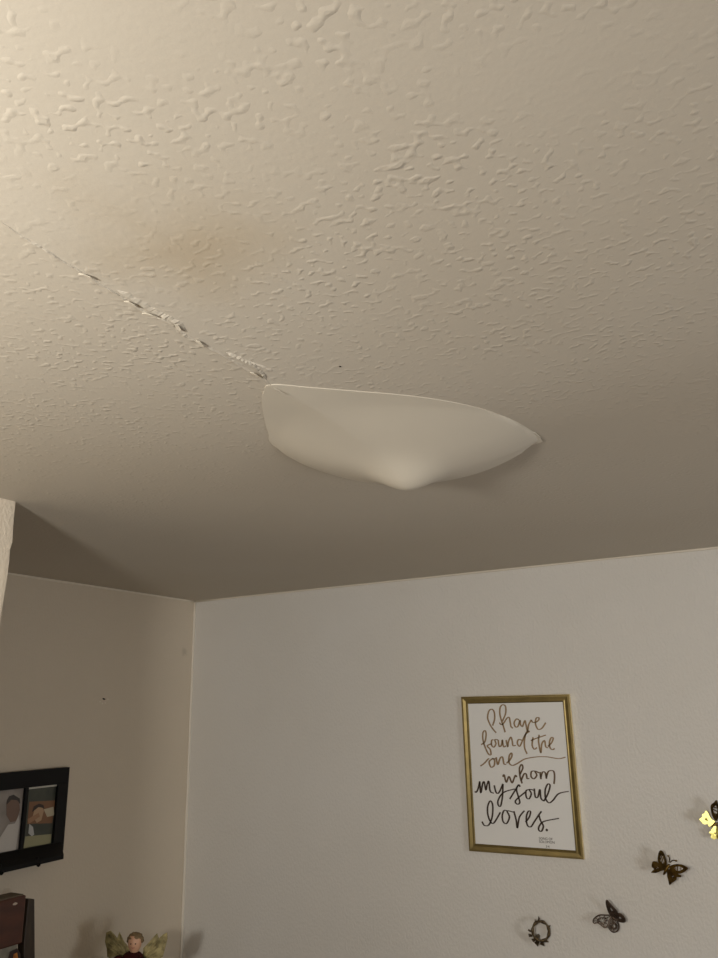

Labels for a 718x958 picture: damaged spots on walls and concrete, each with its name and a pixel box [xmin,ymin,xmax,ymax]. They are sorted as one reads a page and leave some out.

crack [0,221,273,385]